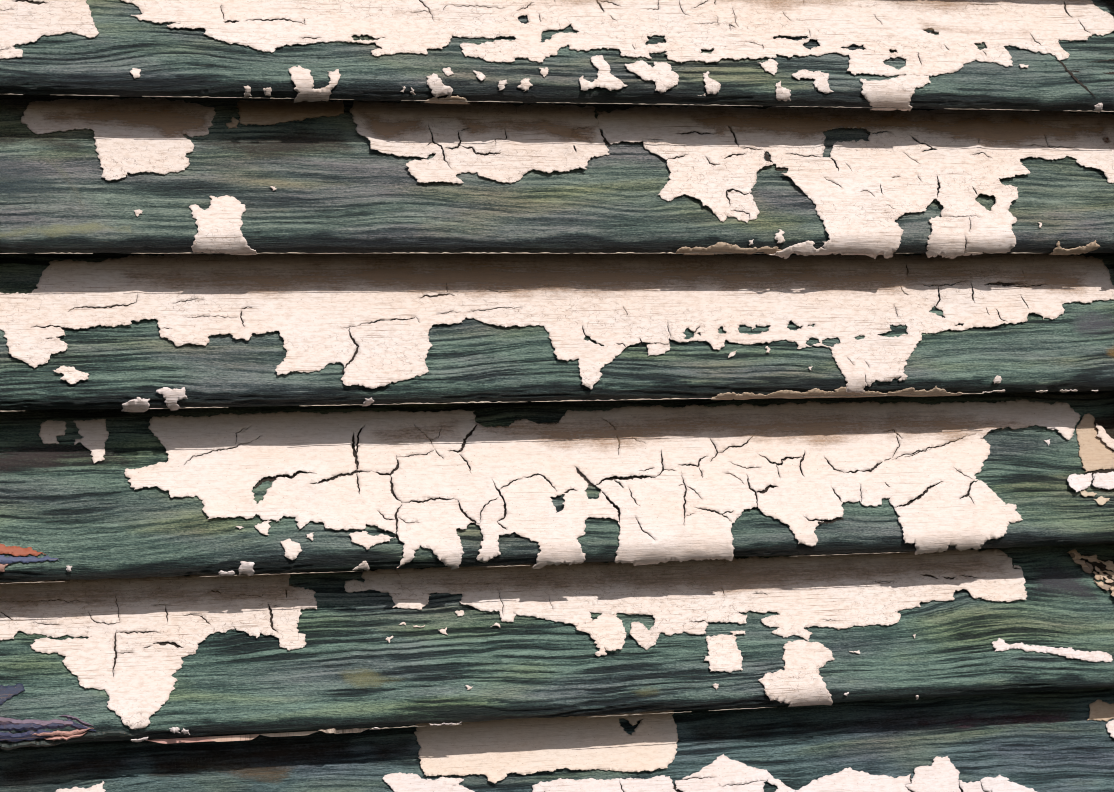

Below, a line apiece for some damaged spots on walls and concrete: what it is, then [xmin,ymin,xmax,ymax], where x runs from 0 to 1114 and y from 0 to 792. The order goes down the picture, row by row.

peeling [0,0,1114,400]
crack [35,300,137,339]
crack [342,283,513,373]
crack [935,281,1044,308]
peeling [121,387,228,412]
peeling [38,419,109,464]
crack [255,420,977,540]
peeling [124,399,1114,707]
peeling [0,544,333,742]
peeling [56,781,106,792]
peeling [370,710,1037,792]
peeling [1087,699,1114,738]